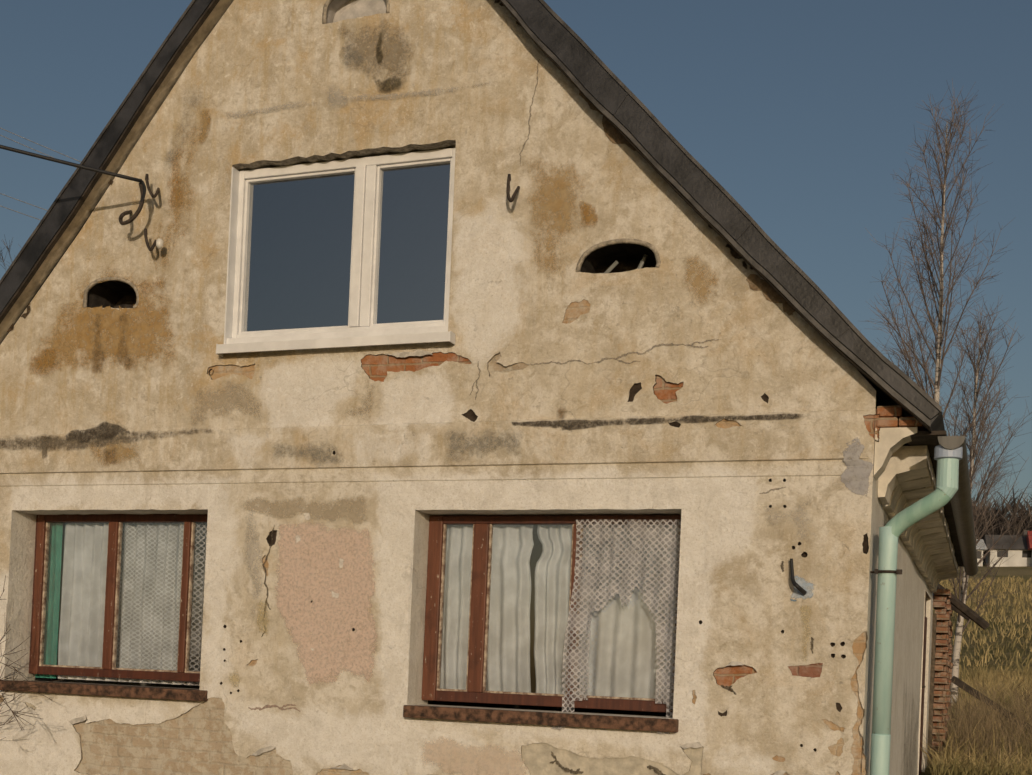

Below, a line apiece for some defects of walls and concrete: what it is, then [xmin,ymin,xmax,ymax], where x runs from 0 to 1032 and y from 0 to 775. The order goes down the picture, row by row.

leakage [344,29,410,92]
flaking render [361,349,471,382]
crack [530,339,718,365]
flaking render [628,375,684,404]
leakage [0,386,257,463]
leakage [450,414,799,455]
crack [261,528,274,637]
peeling [247,498,377,683]
flaking render [713,661,757,691]
flaking render [787,663,823,678]
flaking render [69,682,293,775]
flaking render [521,742,711,775]